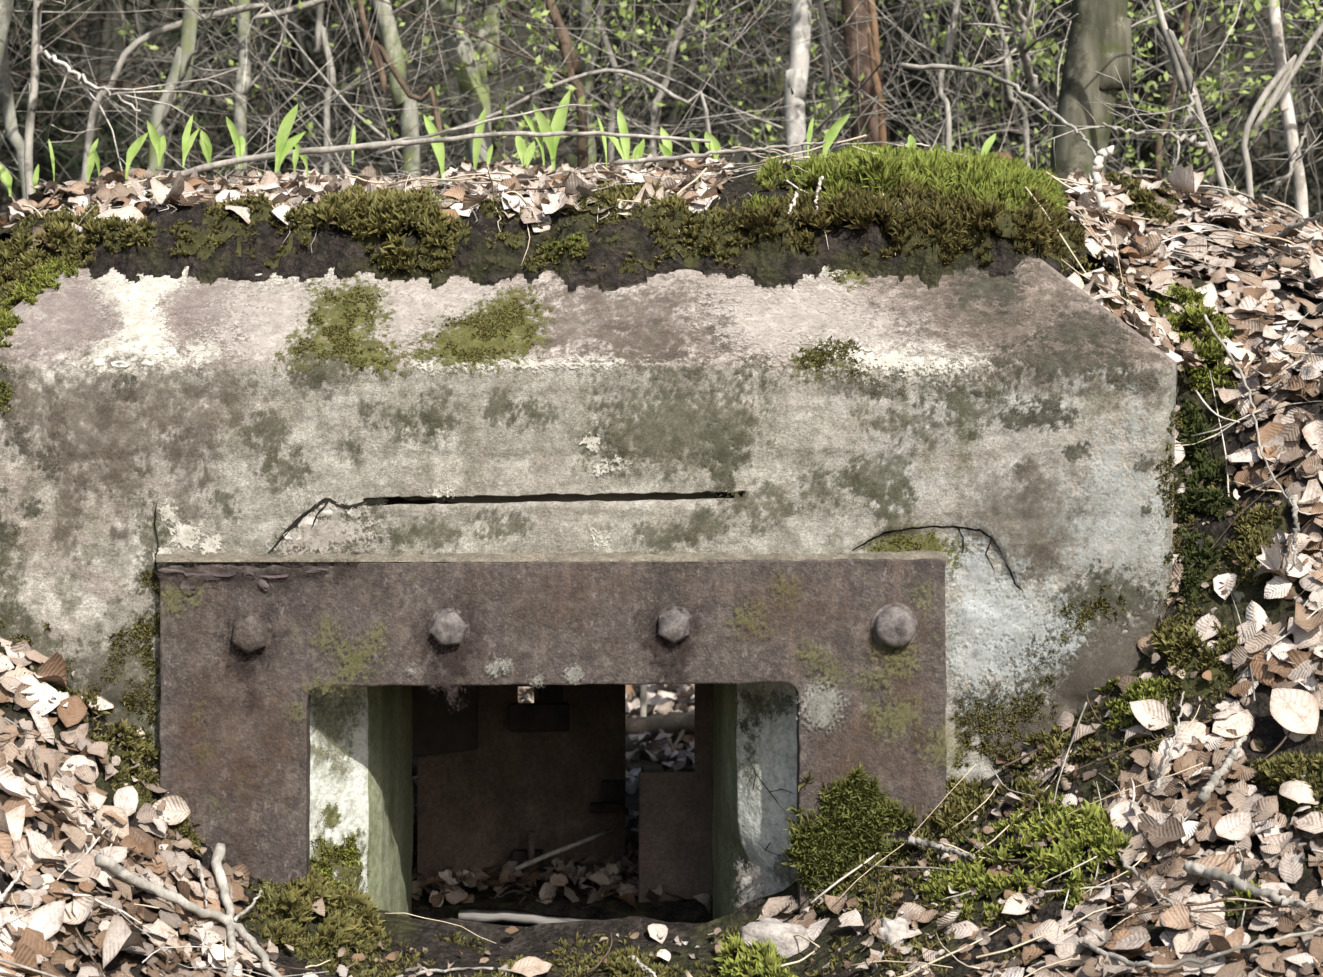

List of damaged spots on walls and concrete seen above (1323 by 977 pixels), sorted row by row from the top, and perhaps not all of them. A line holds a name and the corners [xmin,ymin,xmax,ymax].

crack [266,497,454,555]
crack [714,491,743,499]
crack [852,525,1023,591]
corrosion [214,605,293,715]
corrosion [409,599,489,707]
corrosion [636,602,707,707]